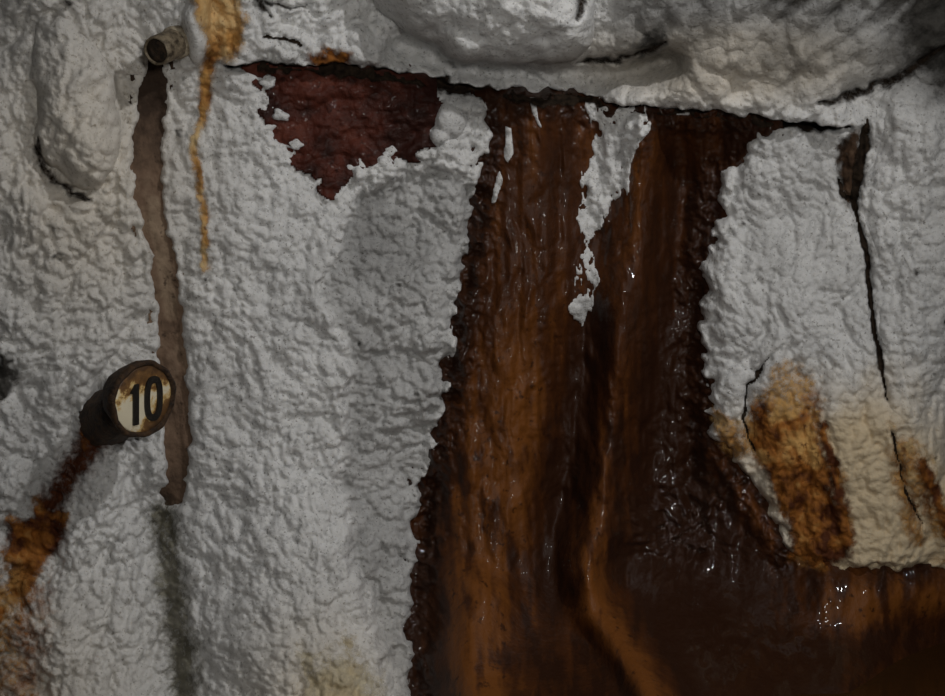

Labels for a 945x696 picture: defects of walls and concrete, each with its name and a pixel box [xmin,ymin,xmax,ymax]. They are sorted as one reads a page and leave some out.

rust [189,0,248,271]
spalling [242,62,443,200]
crack [643,45,945,400]
rust [403,86,945,696]
rust [0,430,107,696]